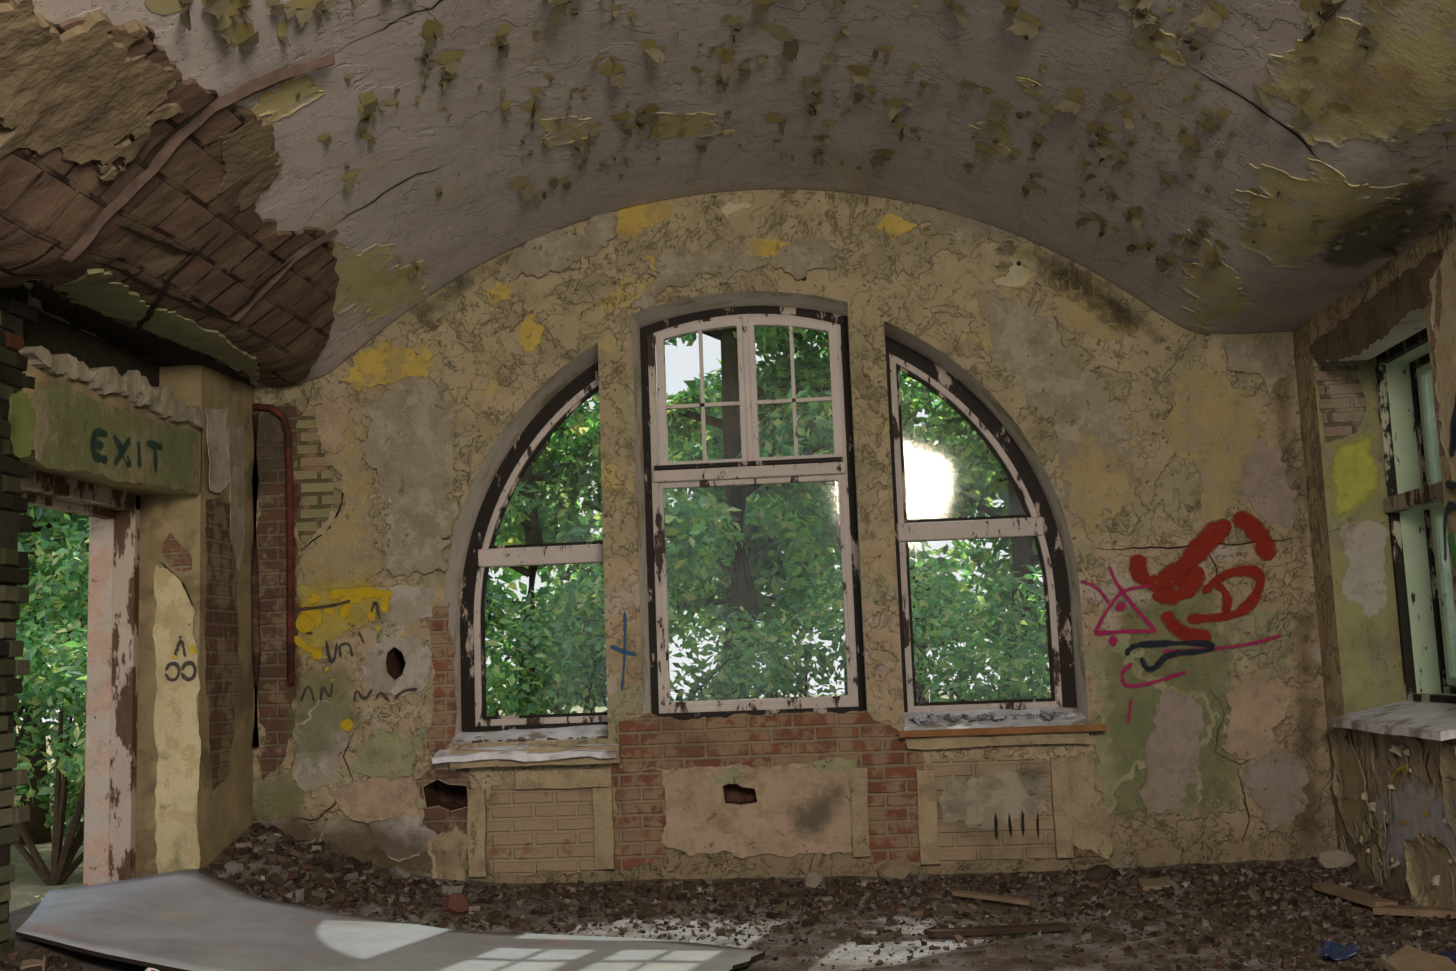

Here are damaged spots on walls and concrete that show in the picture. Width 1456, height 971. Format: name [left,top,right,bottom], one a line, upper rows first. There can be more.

peeling [145,0,334,54]
crack [336,0,443,53]
peeling [252,75,325,122]
peeling [345,19,466,146]
peeling [499,54,743,205]
crack [1187,65,1325,163]
peeling [332,240,433,323]
peeling [690,0,1456,490]
flaking render [1239,438,1298,528]
flaking render [1339,520,1390,619]
flaking render [486,710,1105,876]
flaking render [1332,727,1456,911]